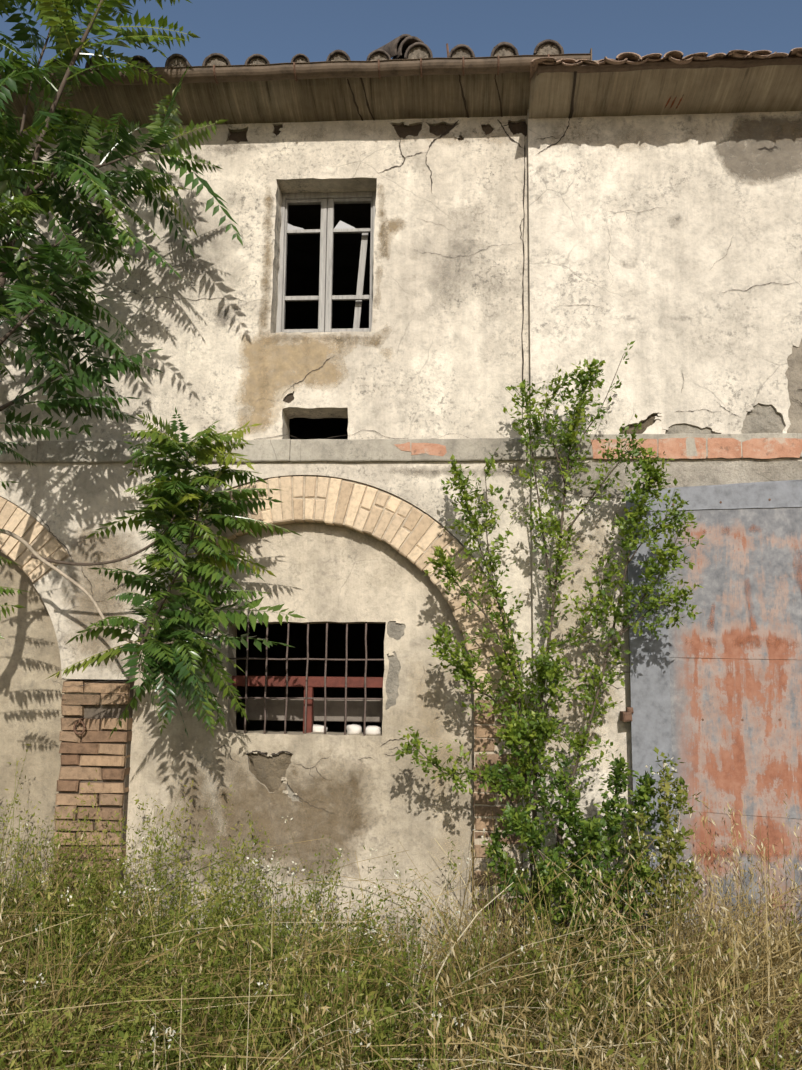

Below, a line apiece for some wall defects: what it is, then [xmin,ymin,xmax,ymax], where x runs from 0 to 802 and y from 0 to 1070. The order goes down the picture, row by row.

flaking render [229,128,248,143]
crack [377,75,469,193]
flaking render [392,121,464,141]
damp [715,118,802,180]
crack [422,71,577,420]
flaking render [591,339,802,459]
flaking render [394,442,447,456]
flaking render [246,750,301,802]